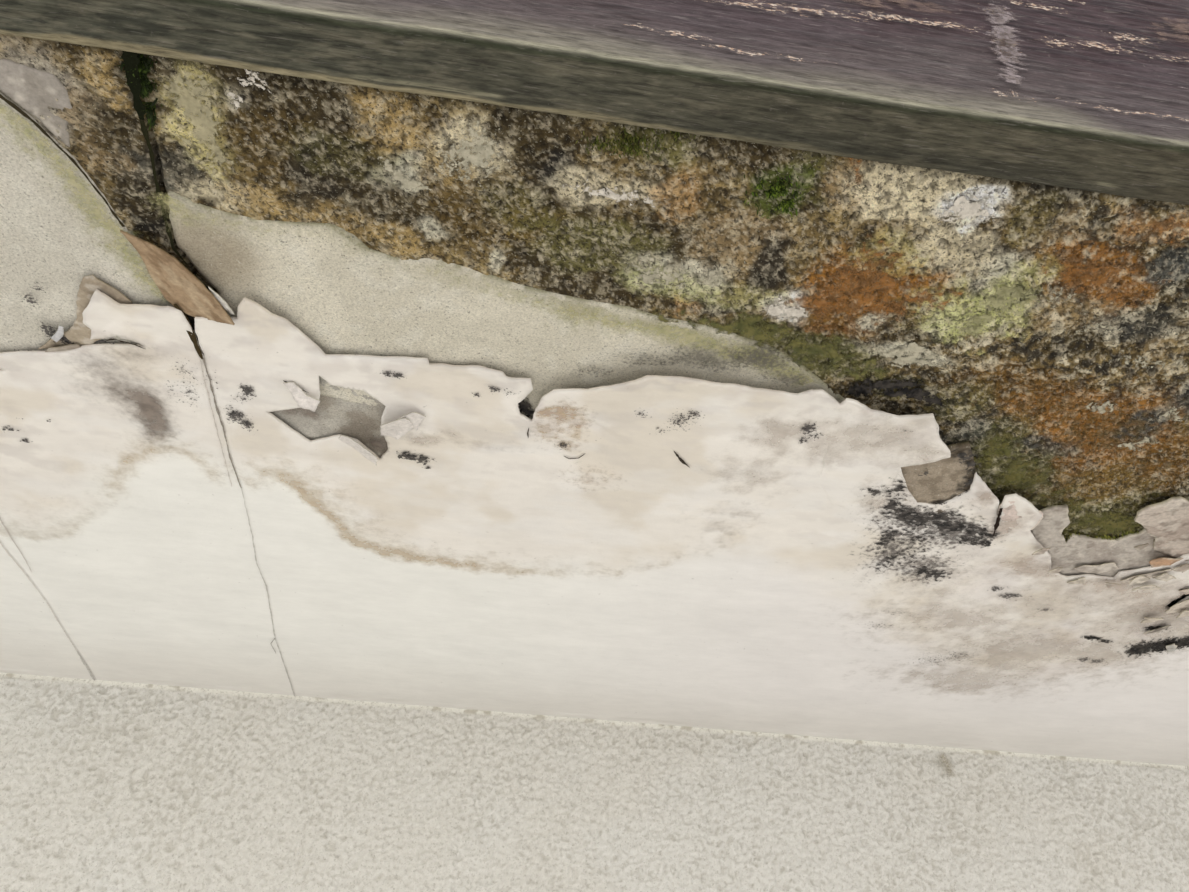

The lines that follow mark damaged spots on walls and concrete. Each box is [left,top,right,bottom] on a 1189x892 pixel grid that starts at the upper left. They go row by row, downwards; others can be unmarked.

crack [121,51,188,265]
leakage [40,321,74,344]
spalling [0,34,1189,634]
leakage [109,383,169,437]
crack [173,304,296,697]
leakage [226,383,257,432]
leakage [370,438,437,469]
leakage [472,386,580,428]
leakage [656,408,700,433]
leakage [860,452,1017,581]
crack [0,518,95,681]
leakage [913,580,1189,691]